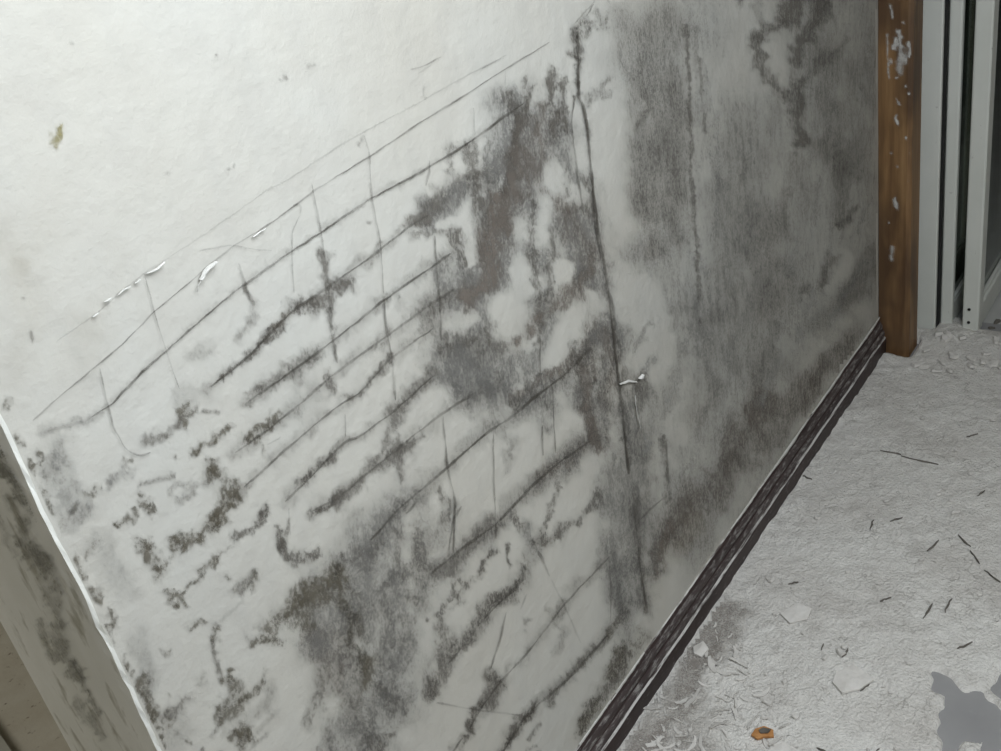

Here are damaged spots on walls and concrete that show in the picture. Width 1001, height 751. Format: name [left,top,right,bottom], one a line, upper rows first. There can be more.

crack [377,169,425,196]
crack [573,44,600,235]
crack [102,298,227,410]
crack [215,296,315,383]
damp [250,249,354,359]
crack [293,221,337,251]
crack [327,242,451,345]
damp [407,68,653,484]
damp [170,458,269,552]
damp [135,676,179,747]
damp [194,618,264,723]
damp [251,504,404,751]